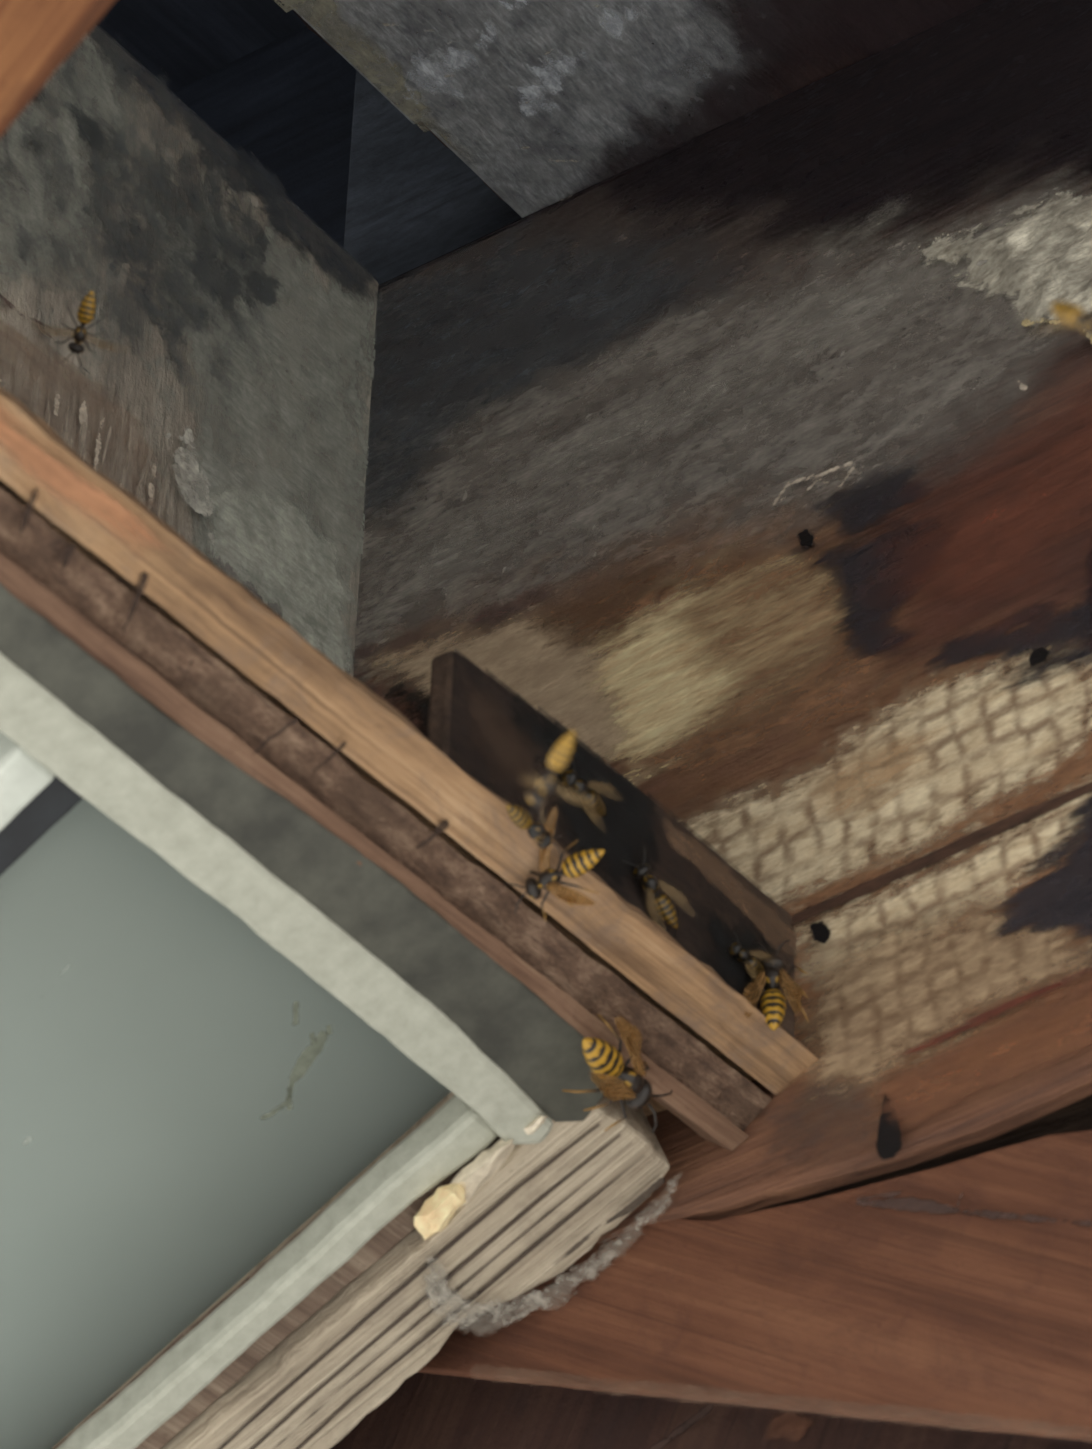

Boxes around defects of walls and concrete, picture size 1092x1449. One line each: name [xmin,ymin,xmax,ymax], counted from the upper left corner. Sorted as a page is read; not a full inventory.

peeling [923,238,959,264]
damp [0,0,1092,1011]
damp [770,702,1092,1123]